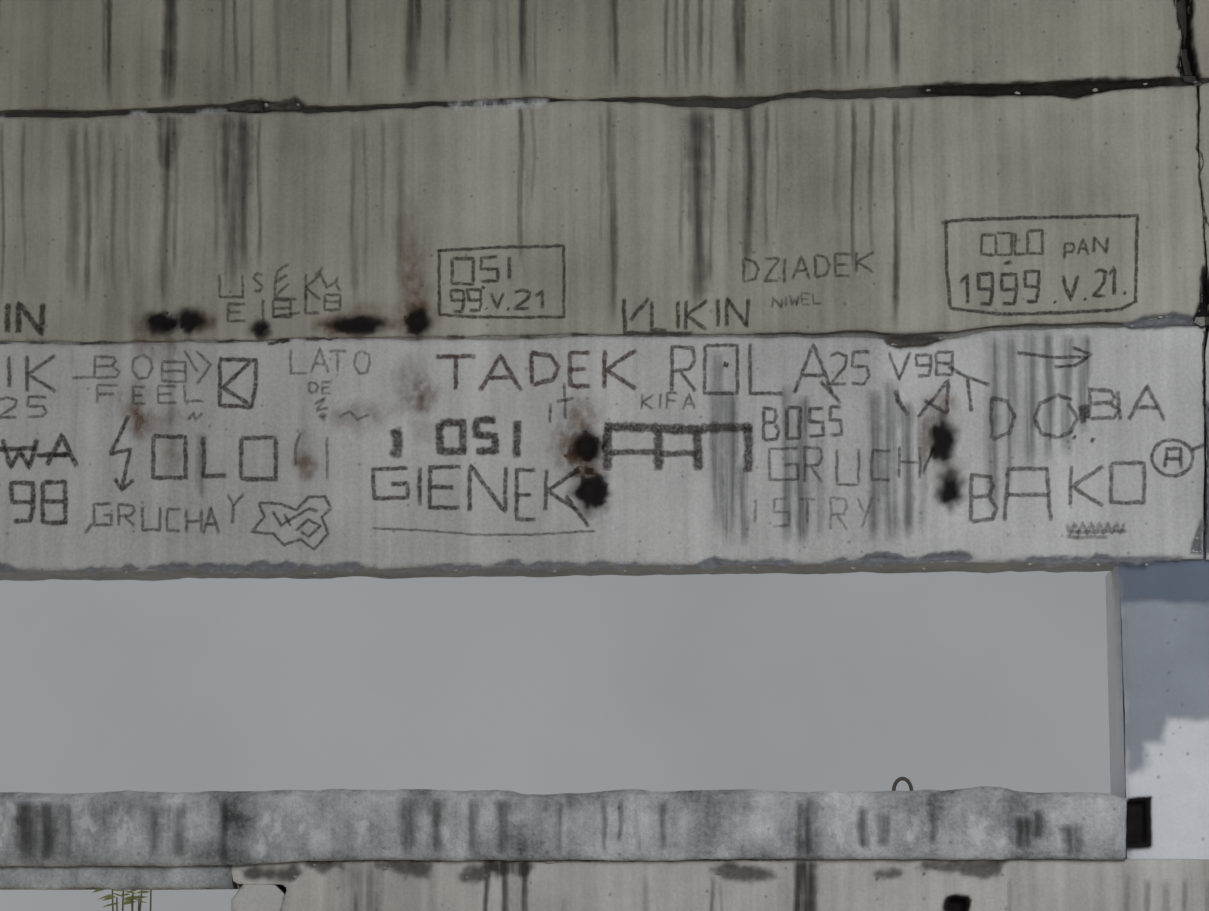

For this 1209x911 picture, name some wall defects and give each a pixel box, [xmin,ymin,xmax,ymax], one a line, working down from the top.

leakage [165,0,175,72]
leakage [691,116,703,283]
crack [1196,86,1209,267]
corrosion [149,311,205,333]
corrosion [333,316,384,333]
corrosion [573,415,599,459]
corrosion [575,478,607,507]
corrosion [932,421,960,503]
crack [1201,331,1209,547]
leakage [17,805,51,854]
leakage [484,860,531,911]
leakage [795,817,815,911]